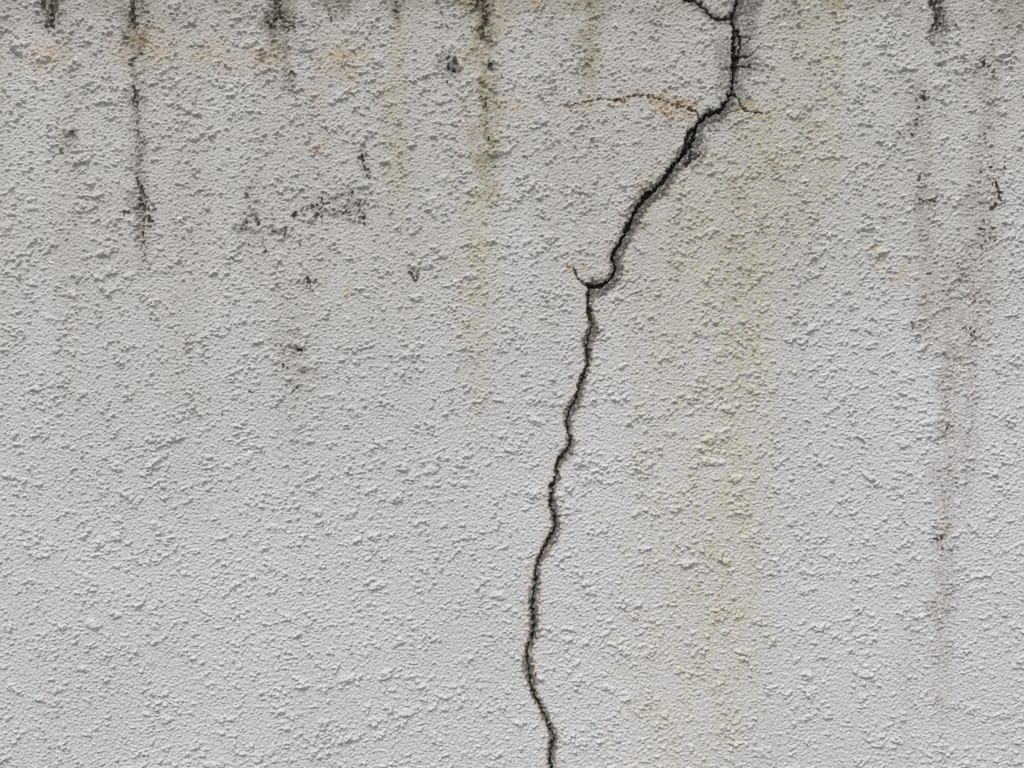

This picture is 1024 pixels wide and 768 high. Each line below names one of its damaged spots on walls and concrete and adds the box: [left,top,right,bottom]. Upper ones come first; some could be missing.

crack [524,0,750,768]